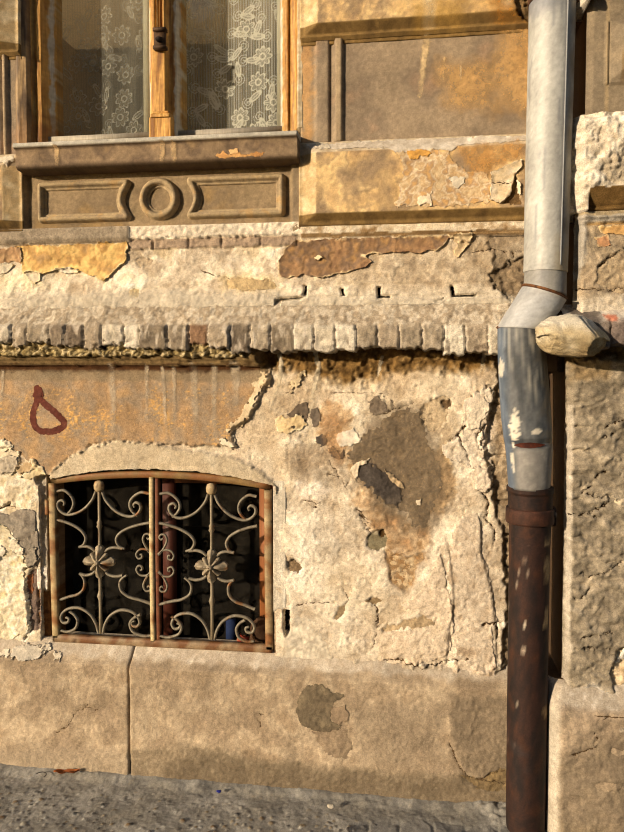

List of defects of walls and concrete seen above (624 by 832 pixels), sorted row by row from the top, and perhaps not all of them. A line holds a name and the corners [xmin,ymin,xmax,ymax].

leakage [420,35,430,85]
flaking render [306,135,526,208]
peeling [0,241,153,284]
peeling [227,232,473,292]
flaking render [219,368,272,450]
flaking render [0,438,46,480]
flaking render [275,384,494,528]
crack [567,471,610,518]
spalling [367,529,425,591]
flaking render [0,525,62,662]
flaking render [446,513,498,677]
crack [449,743,505,785]